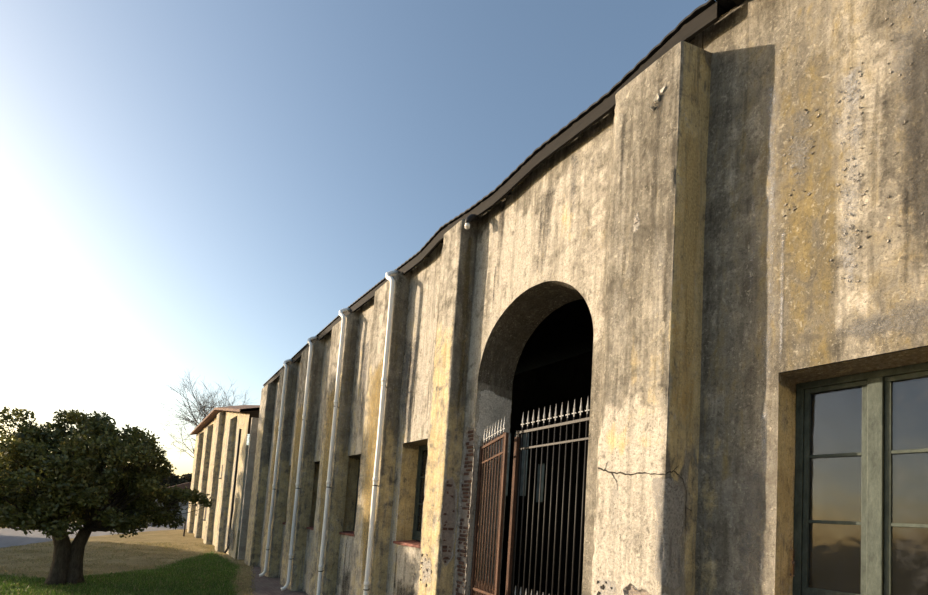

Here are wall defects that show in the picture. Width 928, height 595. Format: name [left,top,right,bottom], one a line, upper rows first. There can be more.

water stain [902,40,928,247]
spalling [420,426,475,595]
spalling [596,579,651,595]
crack [598,462,692,553]